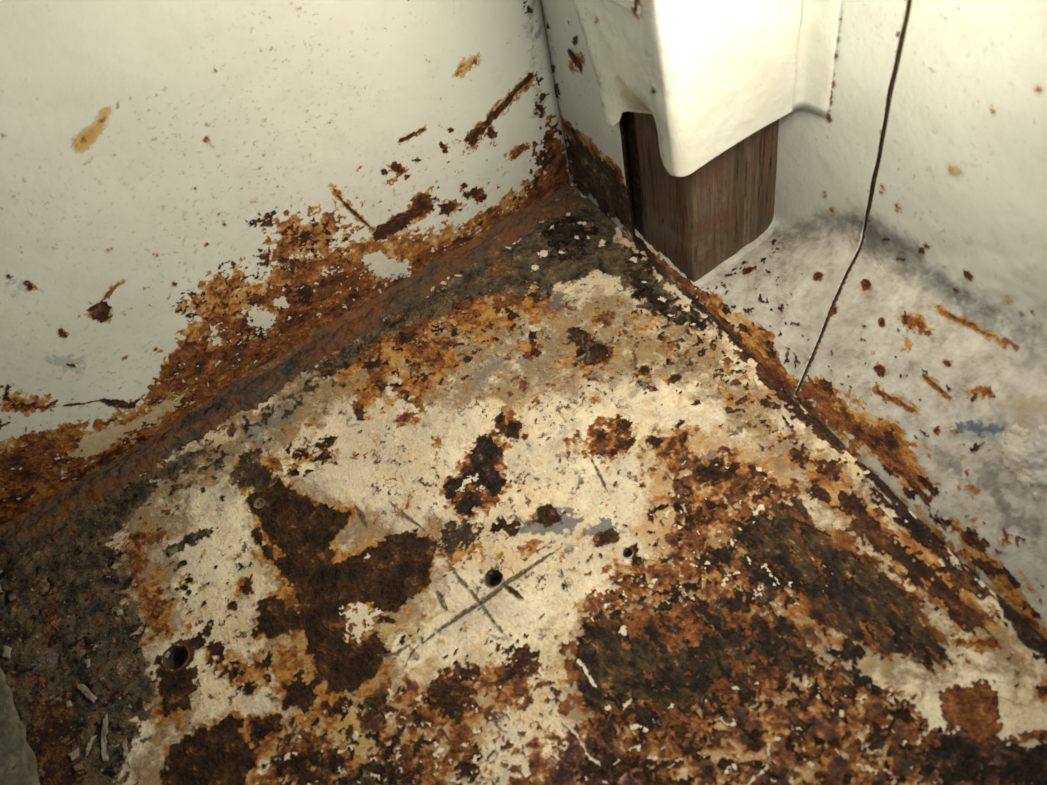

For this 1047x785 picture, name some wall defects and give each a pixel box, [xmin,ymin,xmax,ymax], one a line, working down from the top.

rust [0,71,633,525]
peeling [566,327,620,384]
rust [0,235,1047,785]
peeling [687,451,739,491]
peeling [998,422,1047,500]
peeling [138,429,544,785]
peeling [720,494,953,675]
peeling [77,684,97,703]
peeling [553,583,889,766]
peeling [85,713,109,762]
peeling [743,743,771,785]
peeling [907,722,1047,785]